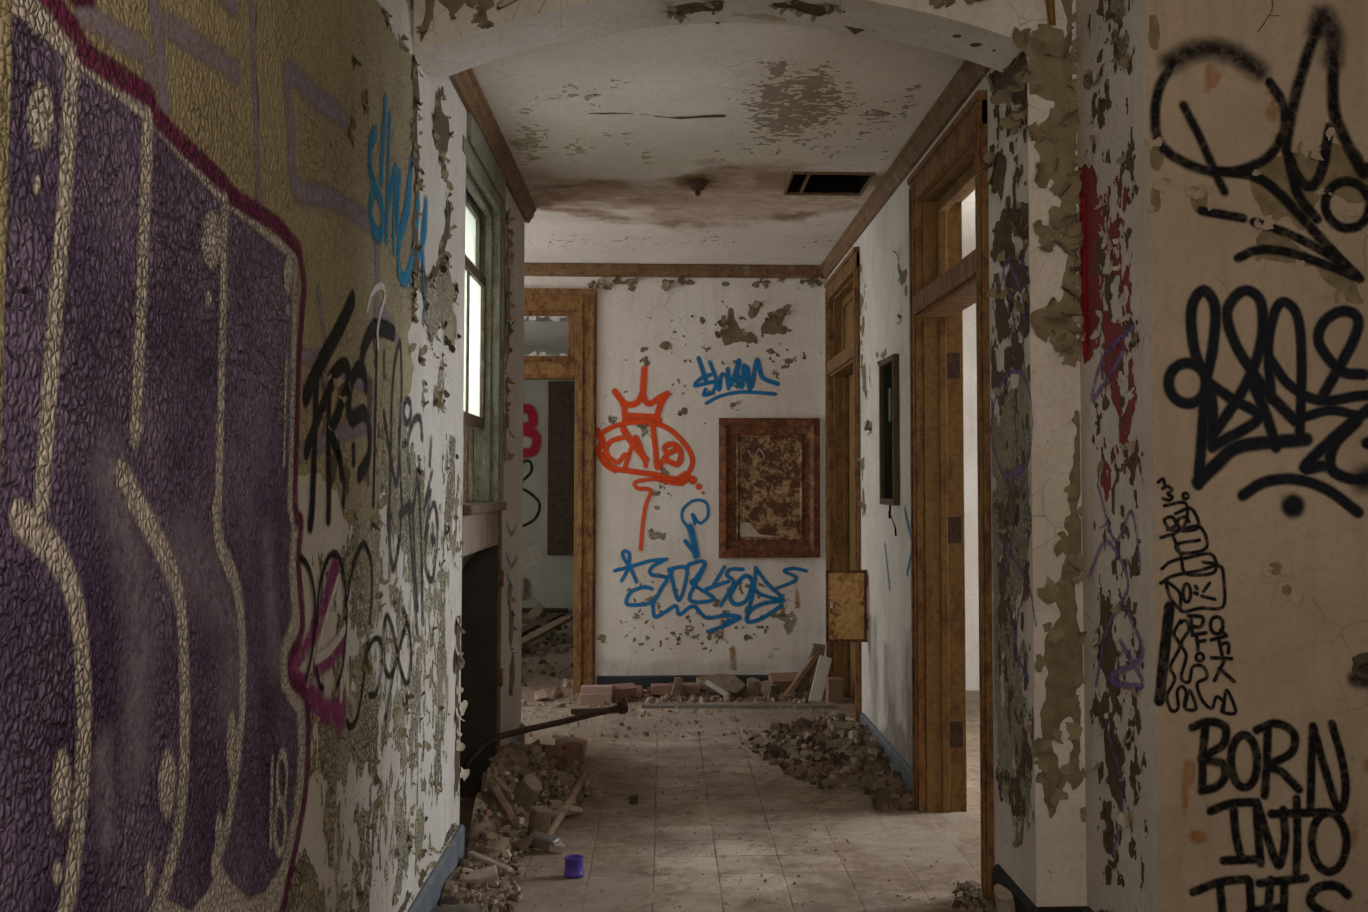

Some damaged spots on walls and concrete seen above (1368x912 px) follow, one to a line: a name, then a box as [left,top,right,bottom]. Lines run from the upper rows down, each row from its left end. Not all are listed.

peeling [666,0,864,35]
peeling [507,79,656,174]
peeling [697,57,924,168]
peeling [0,0,13,472]
peeling [503,209,661,462]
peeling [625,273,823,416]
peeling [893,251,908,324]
peeling [62,0,494,912]
peeling [646,528,666,540]
peeling [652,464,672,510]
peeling [507,583,517,696]
peeling [620,571,798,653]